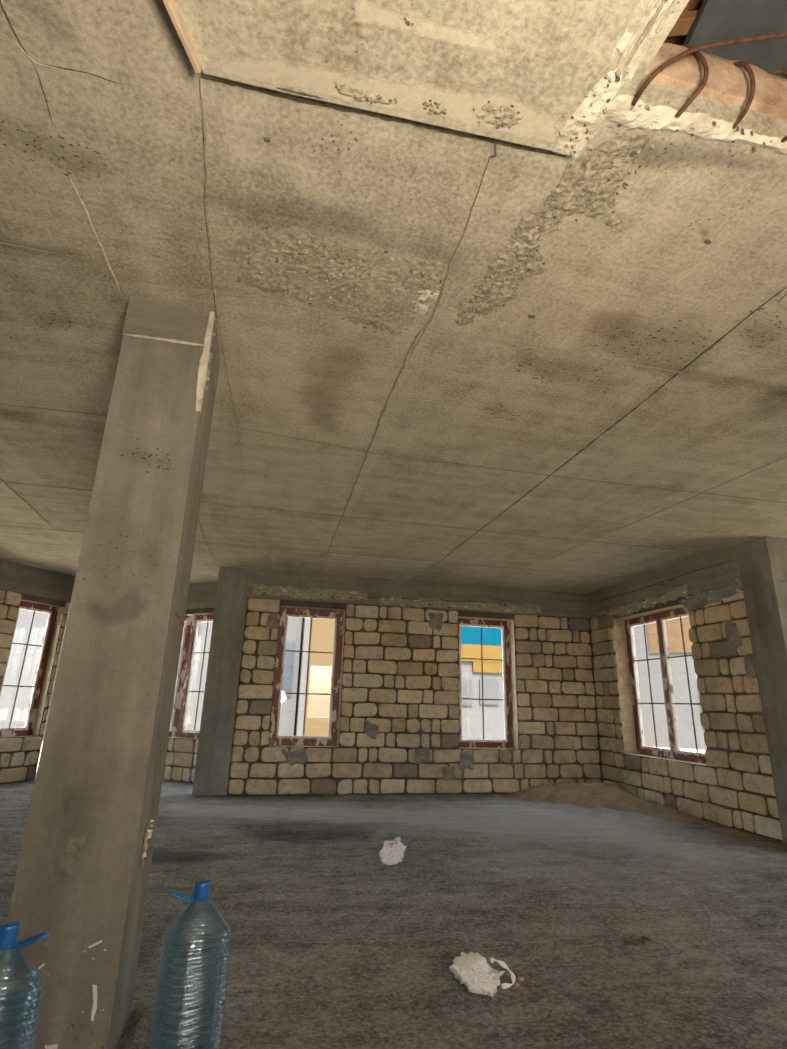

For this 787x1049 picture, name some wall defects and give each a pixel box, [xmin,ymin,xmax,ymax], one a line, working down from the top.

crack [0,0,124,124]
spalling [553,0,787,208]
crack [0,478,50,525]
spalling [196,312,217,413]
crack [198,76,566,565]
crack [440,286,787,562]